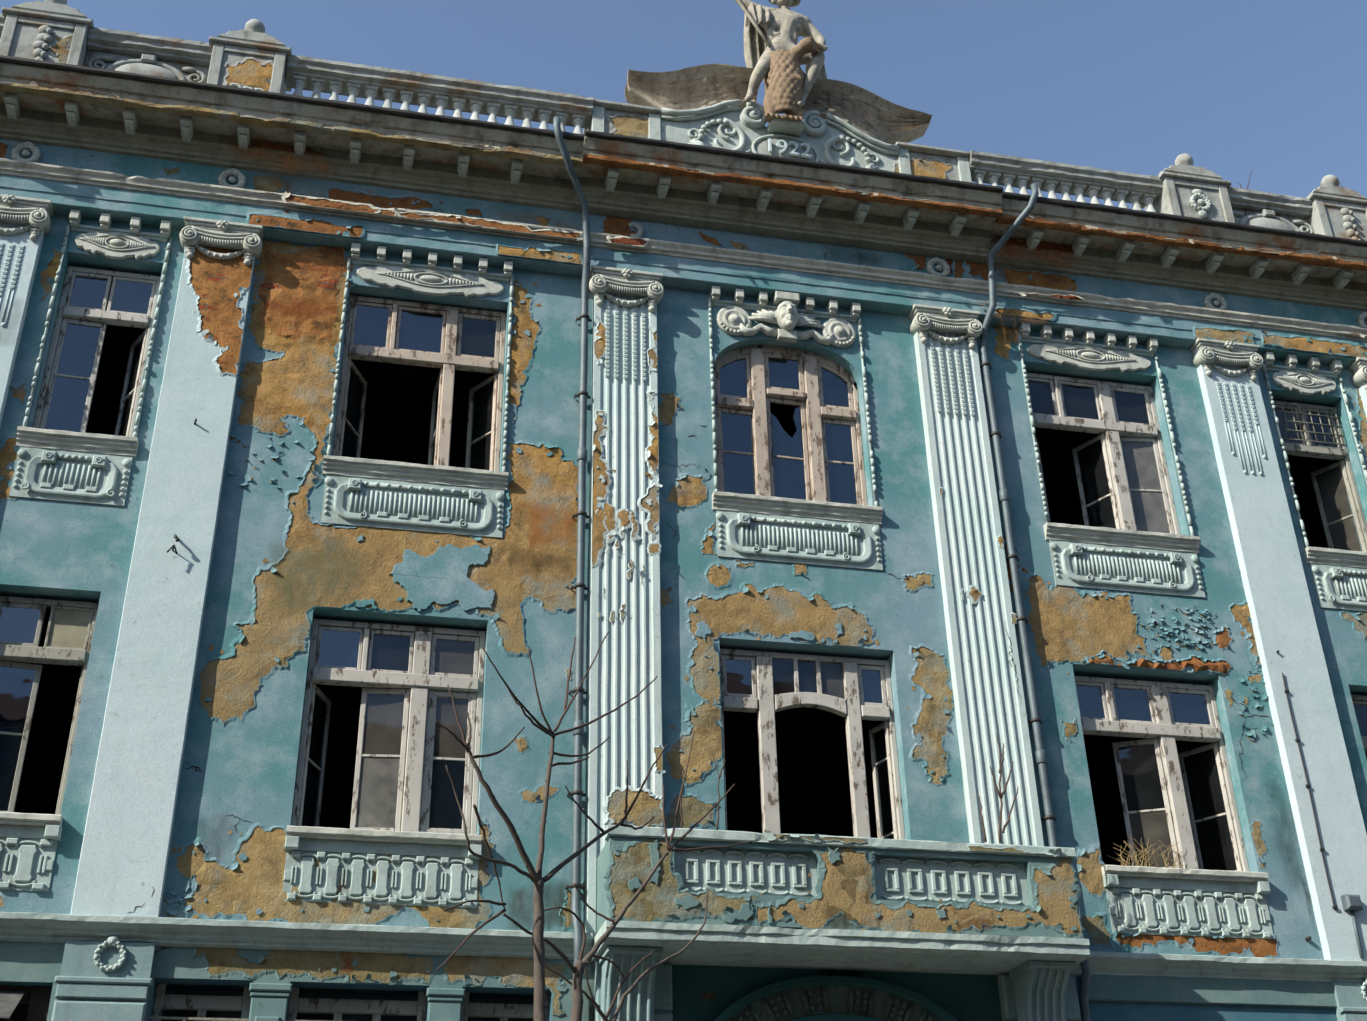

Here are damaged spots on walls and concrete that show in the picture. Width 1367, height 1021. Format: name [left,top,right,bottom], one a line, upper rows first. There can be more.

flaking render [404,135,551,155]
peeling [606,112,664,140]
flaking render [800,182,997,210]
peeling [892,157,953,179]
flaking render [1027,216,1150,235]
peeling [899,253,1085,363]
peeling [1192,326,1367,461]
peeling [184,173,711,728]
peeling [1339,610,1367,642]
peeling [559,518,1280,958]
peeling [171,818,496,929]
peeling [190,947,568,1018]